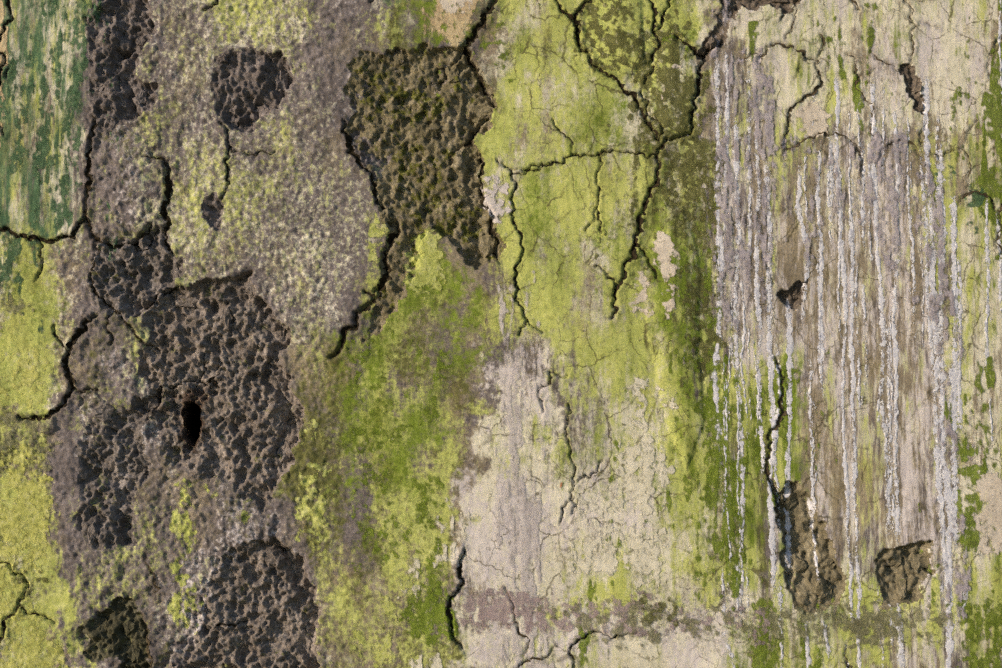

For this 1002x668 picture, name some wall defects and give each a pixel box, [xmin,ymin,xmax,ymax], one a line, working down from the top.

crack [0,115,182,421]
spalling [72,216,305,550]
spalling [168,537,322,668]
spalling [210,44,296,133]
crack [334,128,400,357]
spalling [343,42,512,344]
crack [436,0,723,335]
water stain [460,0,1002,668]
crack [764,362,787,521]
spalling [771,478,847,614]
crack [743,0,1002,254]
spalling [874,540,936,610]